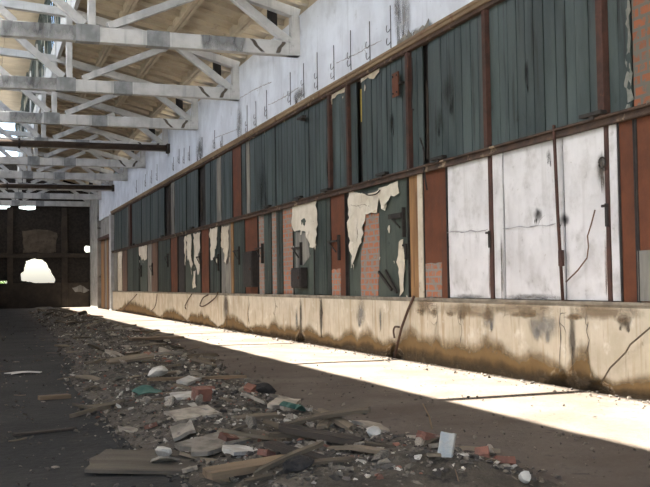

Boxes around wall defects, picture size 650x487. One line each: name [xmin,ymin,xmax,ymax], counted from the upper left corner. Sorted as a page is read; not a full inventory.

leakage [395,0,416,40]
spalling [624,0,634,109]
peeling [184,233,200,289]
peeling [209,226,230,264]
peeling [291,201,318,249]
peeling [347,181,399,296]
peeling [394,239,408,297]
crack [503,215,556,229]
leakage [116,295,650,401]